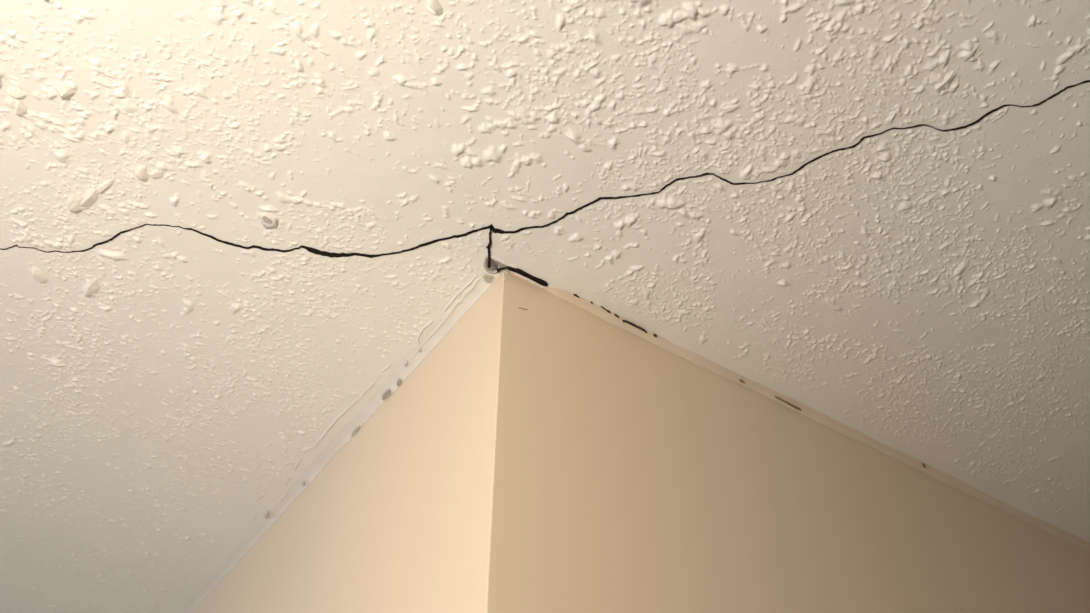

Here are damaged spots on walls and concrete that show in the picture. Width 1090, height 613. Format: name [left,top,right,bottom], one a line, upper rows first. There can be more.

crack [1,80,1090,268]